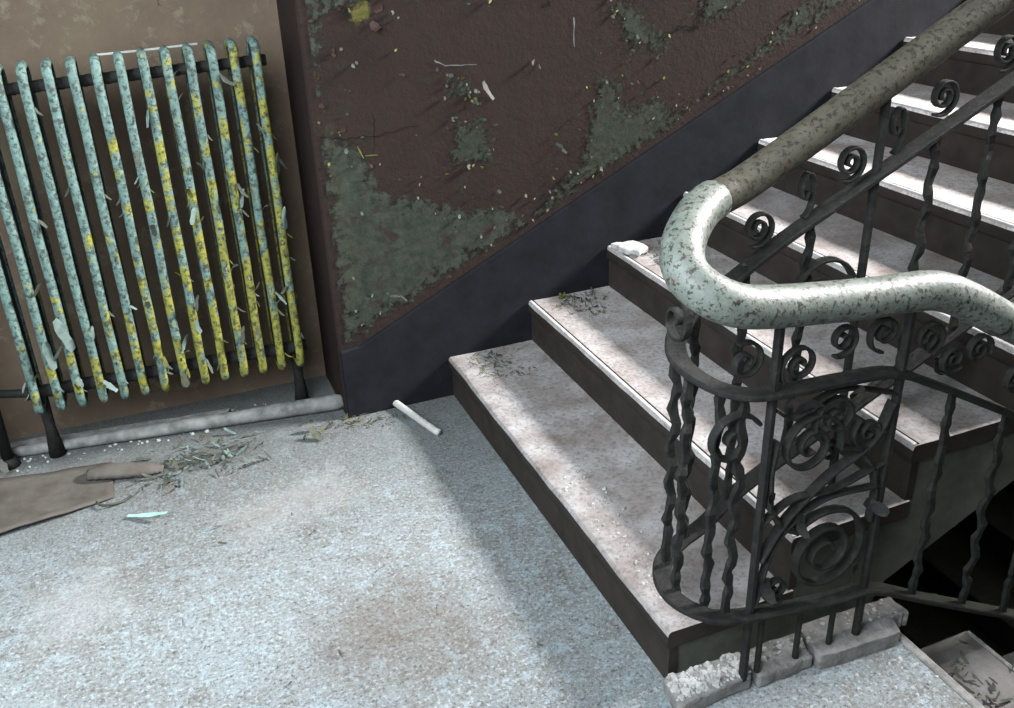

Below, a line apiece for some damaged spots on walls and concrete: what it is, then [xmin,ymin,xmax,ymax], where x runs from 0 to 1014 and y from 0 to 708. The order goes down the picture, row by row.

peeling [305,0,860,343]